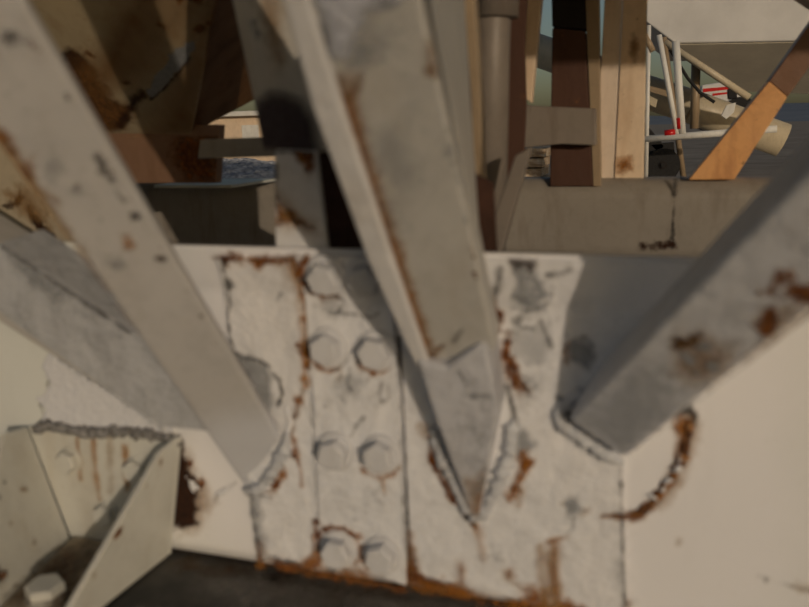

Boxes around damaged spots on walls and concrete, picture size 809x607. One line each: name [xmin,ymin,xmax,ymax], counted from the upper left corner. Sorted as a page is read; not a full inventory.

corrosion [62,49,148,131]
corrosion [170,136,218,182]
corrosion [275,164,311,228]
corrosion [214,251,339,301]
peeling [36,353,173,432]
corrosion [295,337,338,387]
corrosion [494,299,530,422]
corrosion [174,435,205,530]
corrosion [260,469,287,496]
corrosion [505,431,533,502]
corrosion [269,519,480,603]
corrosion [492,538,576,607]